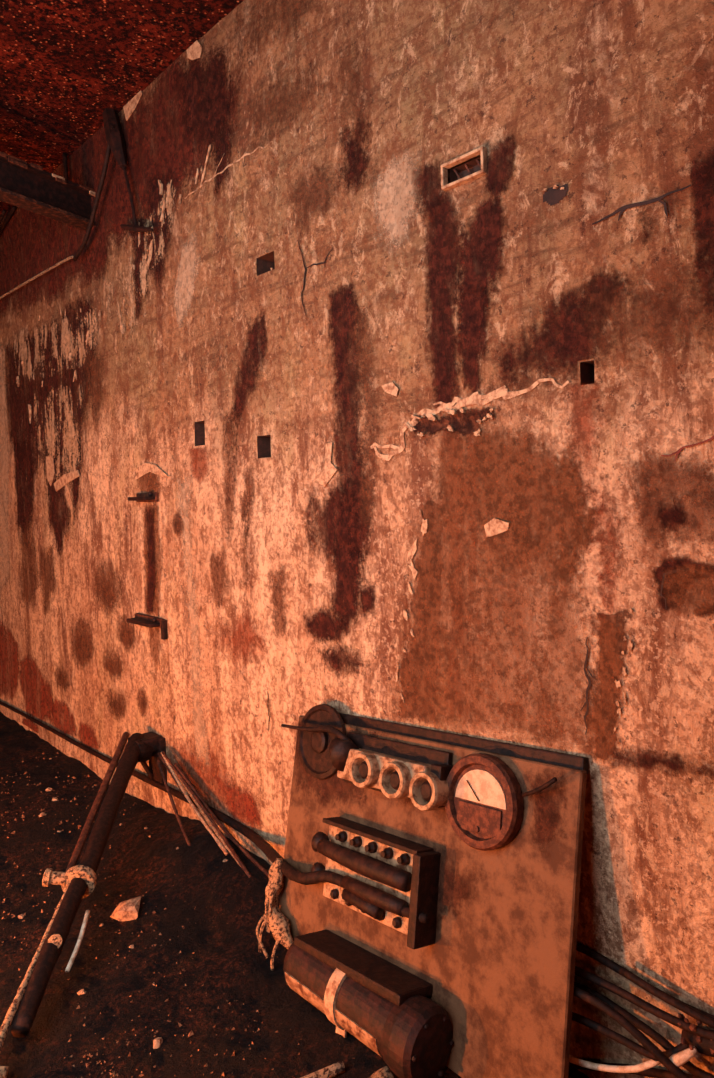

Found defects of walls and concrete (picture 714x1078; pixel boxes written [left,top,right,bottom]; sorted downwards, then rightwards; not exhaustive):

leakage [251,63,325,136]
leakage [339,50,515,408]
crack [592,184,691,225]
leakage [497,149,714,385]
leakage [0,41,239,611]
leakage [304,284,379,675]
spalling [405,407,494,437]
crack [661,436,714,461]
leakage [224,616,263,658]
leakage [269,567,285,634]
leakage [397,430,714,780]
leakage [109,690,147,721]